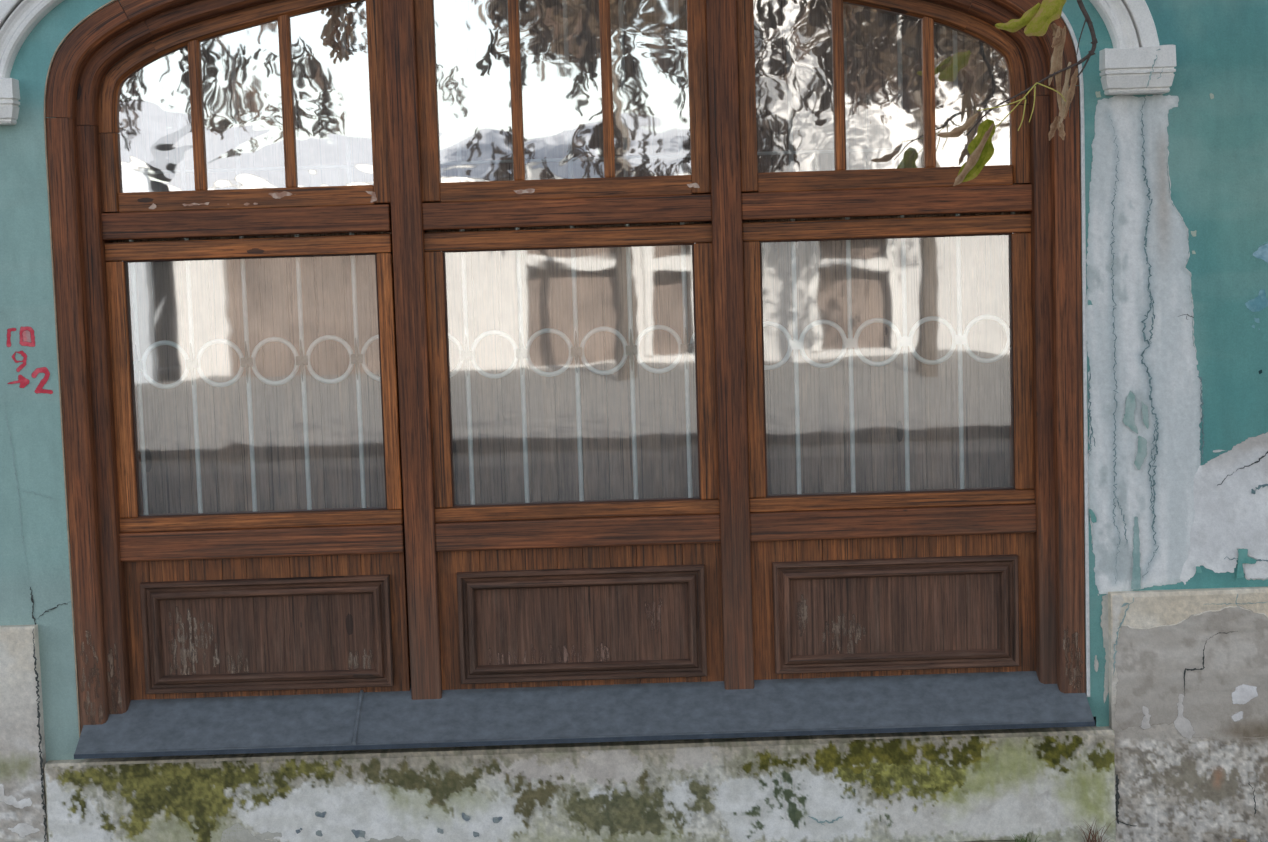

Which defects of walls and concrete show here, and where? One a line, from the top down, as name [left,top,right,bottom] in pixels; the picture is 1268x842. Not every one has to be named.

flaking render [1086,91,1268,740]
crack [1197,376,1268,494]
crack [4,403,68,842]
crack [1184,594,1266,696]
leakage [366,765,694,842]